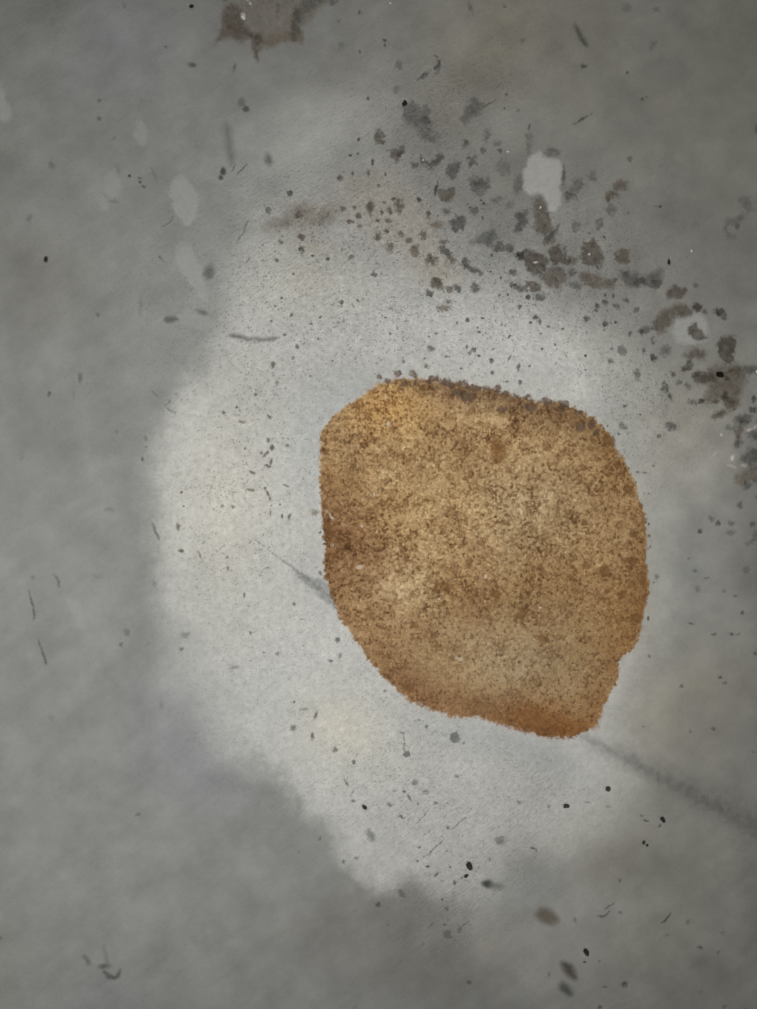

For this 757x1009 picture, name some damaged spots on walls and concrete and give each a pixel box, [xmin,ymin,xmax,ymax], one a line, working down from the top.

damp [477,201,605,301]
rust [318,366,650,738]